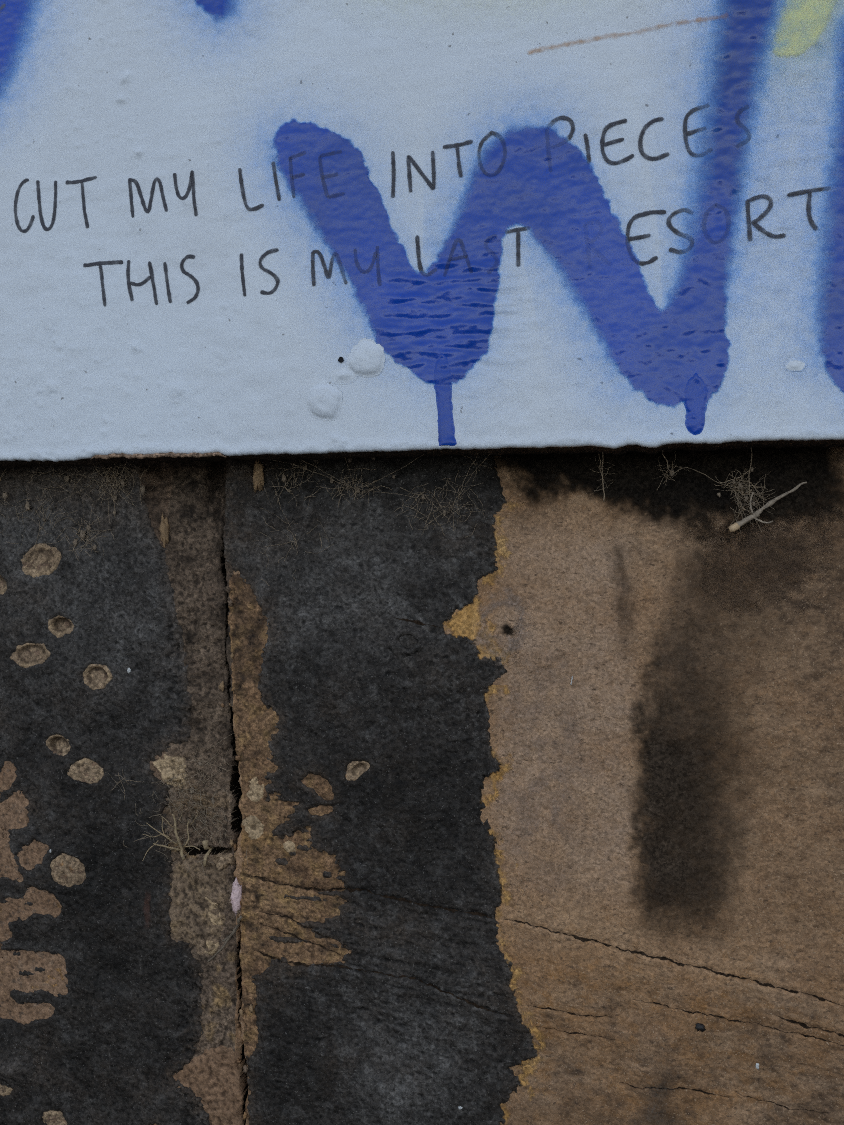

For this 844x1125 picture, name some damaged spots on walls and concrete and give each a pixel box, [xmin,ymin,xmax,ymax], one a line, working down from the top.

peeling [0,761,86,1025]
spalling [46,734,104,784]
spalling [83,664,112,690]
spalling [153,754,187,789]
spalling [169,573,348,1125]
crack [184,537,844,1125]
leakage [632,612,739,929]